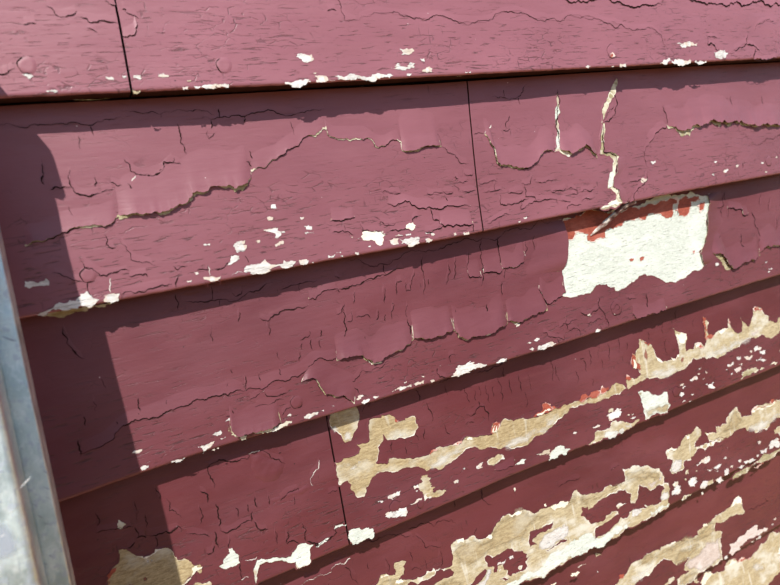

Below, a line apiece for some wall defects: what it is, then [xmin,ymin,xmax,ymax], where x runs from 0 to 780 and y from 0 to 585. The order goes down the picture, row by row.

crack [327,1,667,54]
crack [604,76,618,123]
peeling [79,156,780,518]
peeling [373,398,780,585]
spalling [334,524,374,545]
peeling [105,546,213,585]
spalling [218,547,241,570]
spalling [252,538,350,585]